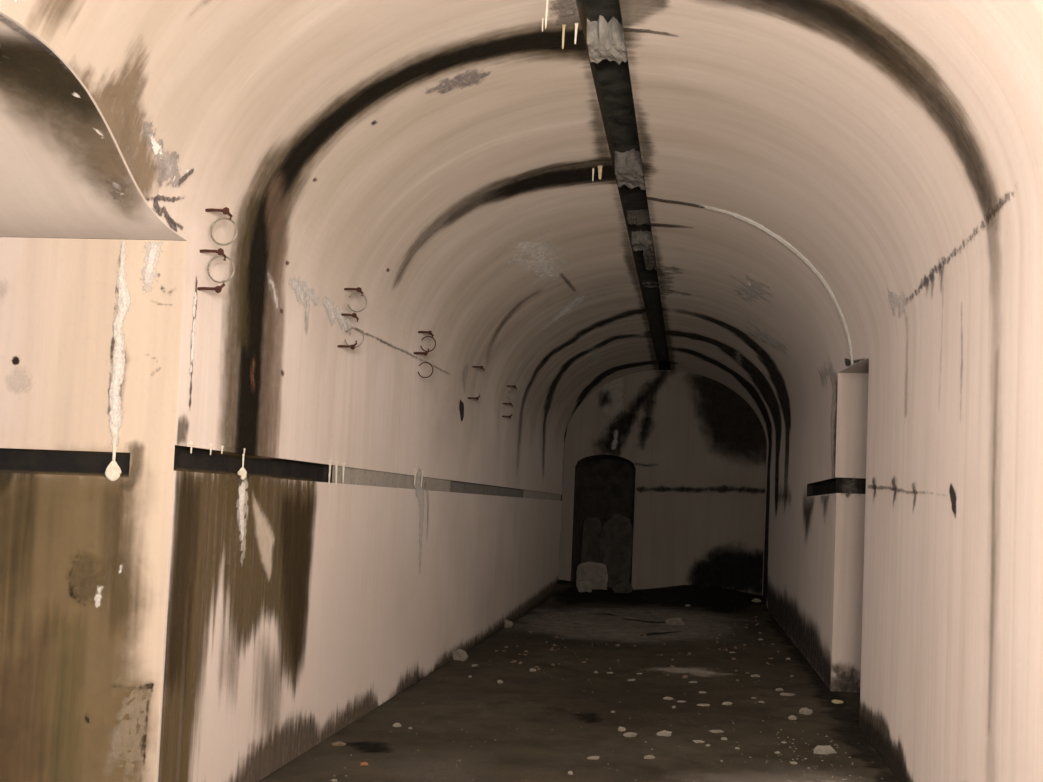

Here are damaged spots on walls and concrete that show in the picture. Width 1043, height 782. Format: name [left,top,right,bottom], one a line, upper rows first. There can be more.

peeling [143,122,189,187]
damp [483,154,617,202]
damp [141,242,163,292]
damp [223,18,589,458]
crack [907,194,1010,300]
damp [108,241,131,446]
damp [177,418,188,444]
damp [0,445,143,782]
damp [158,469,315,782]
flaking render [109,683,154,771]
damp [231,691,378,782]
damp [395,579,913,782]